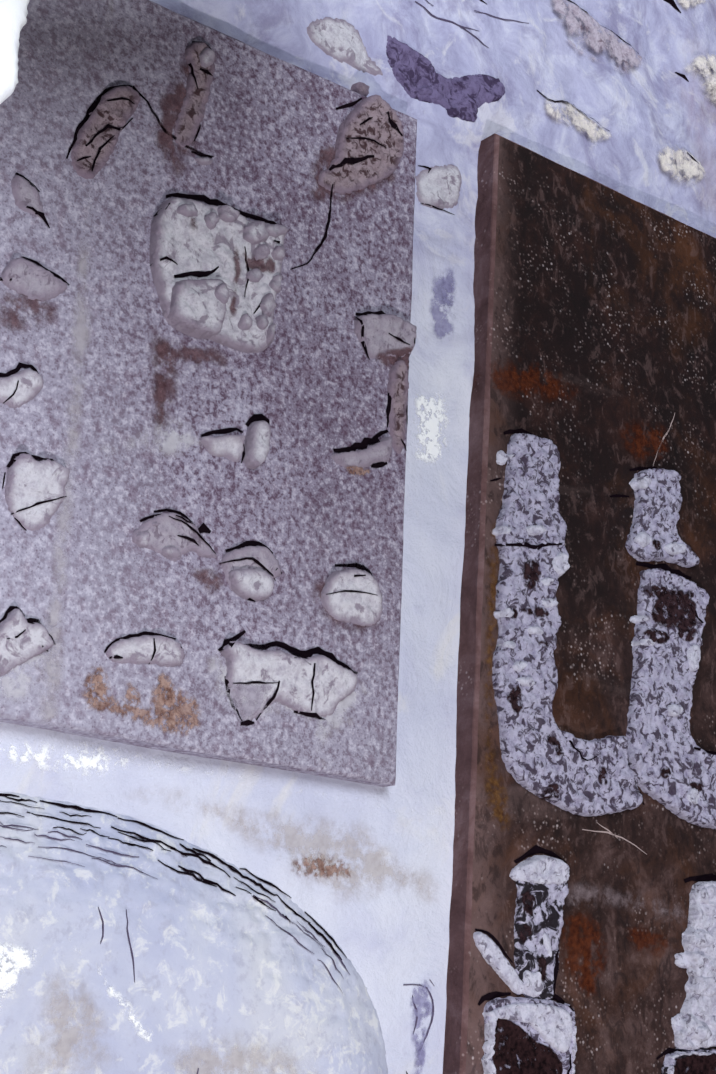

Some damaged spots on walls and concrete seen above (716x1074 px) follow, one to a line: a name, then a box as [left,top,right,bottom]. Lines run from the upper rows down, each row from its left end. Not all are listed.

spalling [66,41,216,179]
spalling [318,82,404,195]
spalling [149,193,288,353]
crack [290,184,333,270]
spalling [2,452,70,531]
spalling [320,563,383,626]
spalling [493,552,570,646]
spalling [630,585,701,672]
corrosion [83,668,199,734]
spalling [218,630,358,726]
crack [0,793,350,992]
spalling [482,855,573,1074]